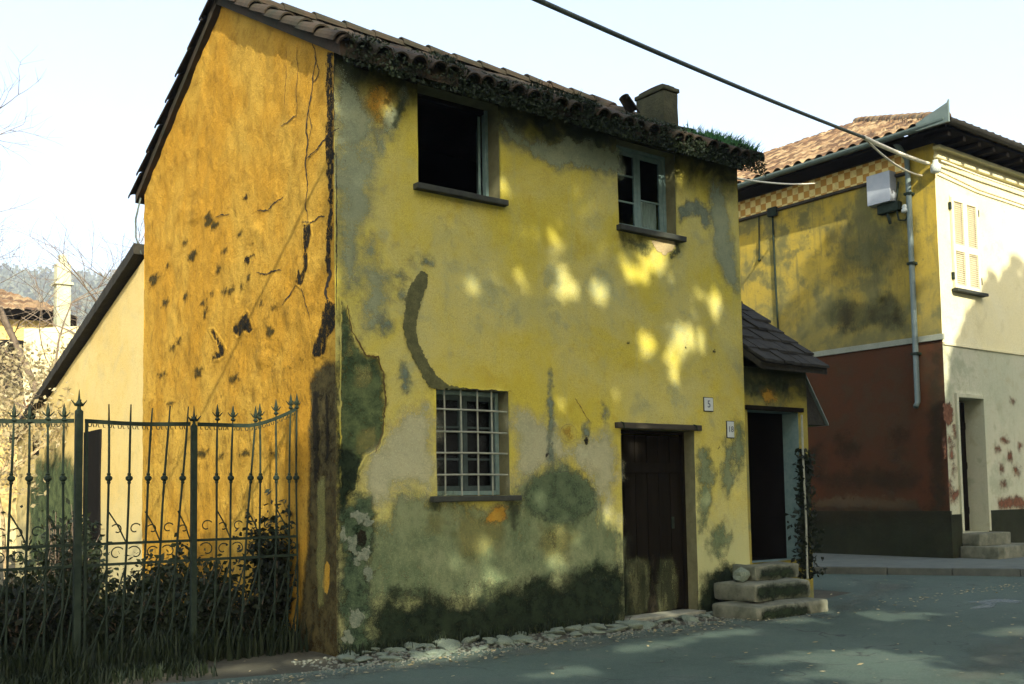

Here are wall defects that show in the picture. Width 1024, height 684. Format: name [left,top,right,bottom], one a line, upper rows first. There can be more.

flaking render [204,211,229,229]
crack [257,44,339,310]
water stain [831,297,903,329]
flaking render [195,219,628,653]
water stain [696,421,745,612]
peeling [943,402,959,502]
peeling [995,437,1024,509]
water stain [366,563,631,648]